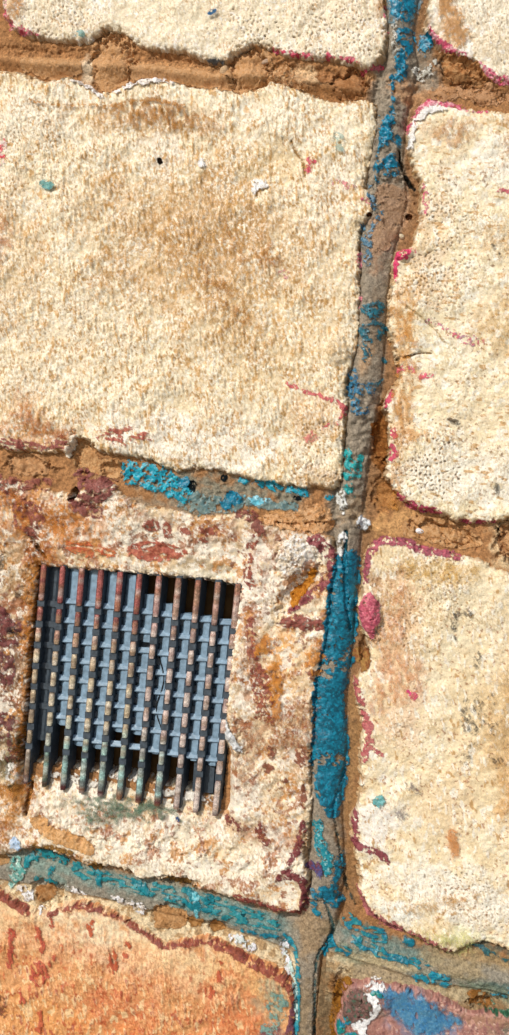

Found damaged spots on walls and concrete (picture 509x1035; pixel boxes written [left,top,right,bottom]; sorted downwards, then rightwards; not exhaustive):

crack [313,818,356,1034]